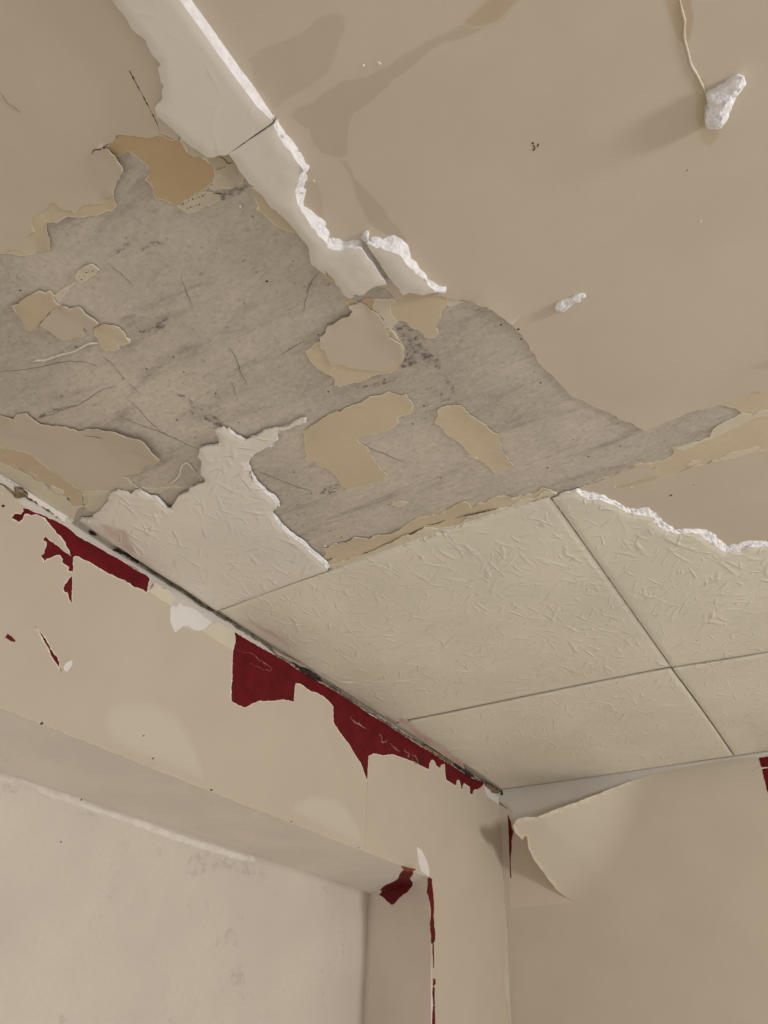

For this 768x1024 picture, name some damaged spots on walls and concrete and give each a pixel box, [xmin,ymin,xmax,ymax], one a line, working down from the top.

peeling [192,0,768,431]
peeling [12,290,130,351]
peeling [0,413,204,522]
peeling [303,391,413,490]
peeling [323,487,557,569]
peeling [434,404,514,473]
peeling [578,449,768,546]
peeling [427,877,436,1024]